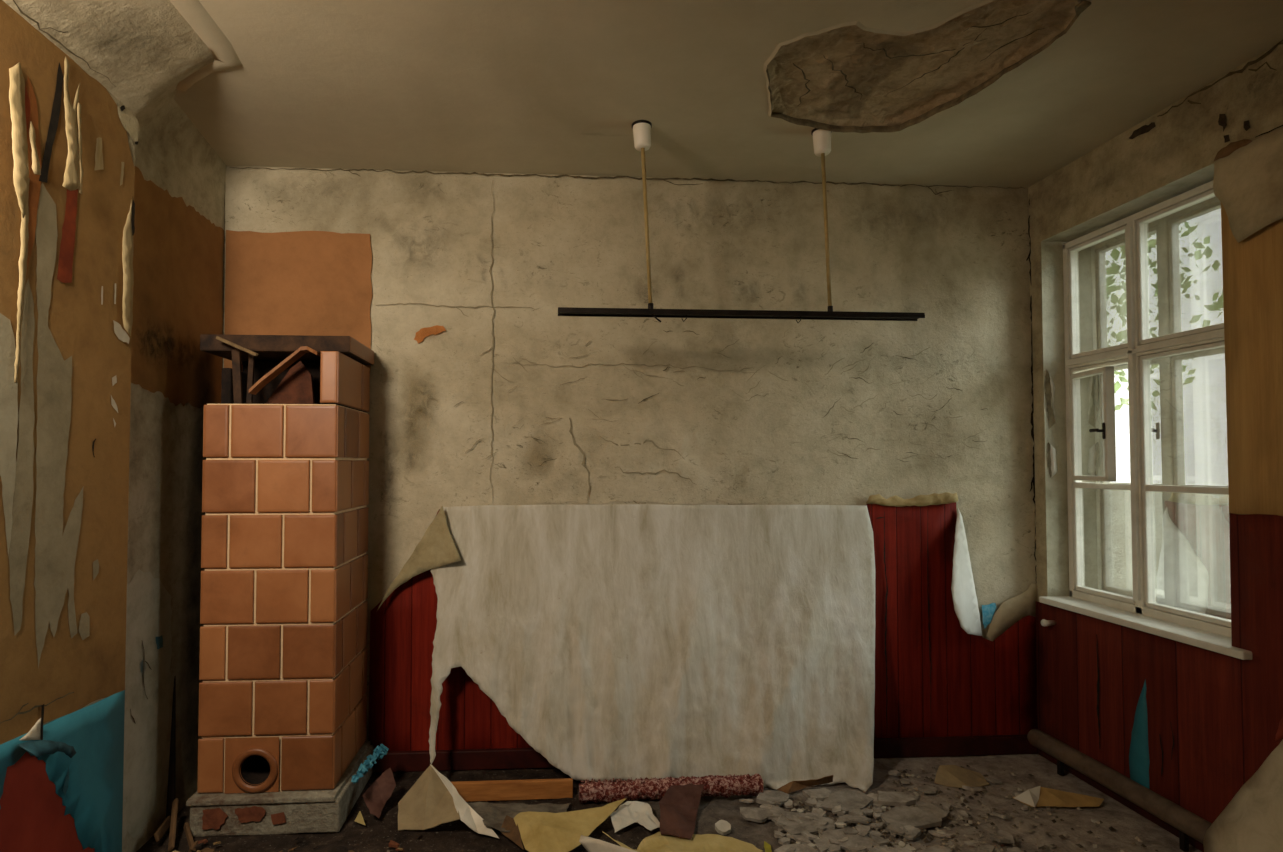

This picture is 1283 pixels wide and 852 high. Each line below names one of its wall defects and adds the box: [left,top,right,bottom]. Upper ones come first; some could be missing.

crack [1157,40,1283,117]
flaking render [117,105,140,145]
peeling [1213,112,1283,243]
peeling [0,56,104,669]
peeling [982,603,996,629]
peeling [18,704,76,795]